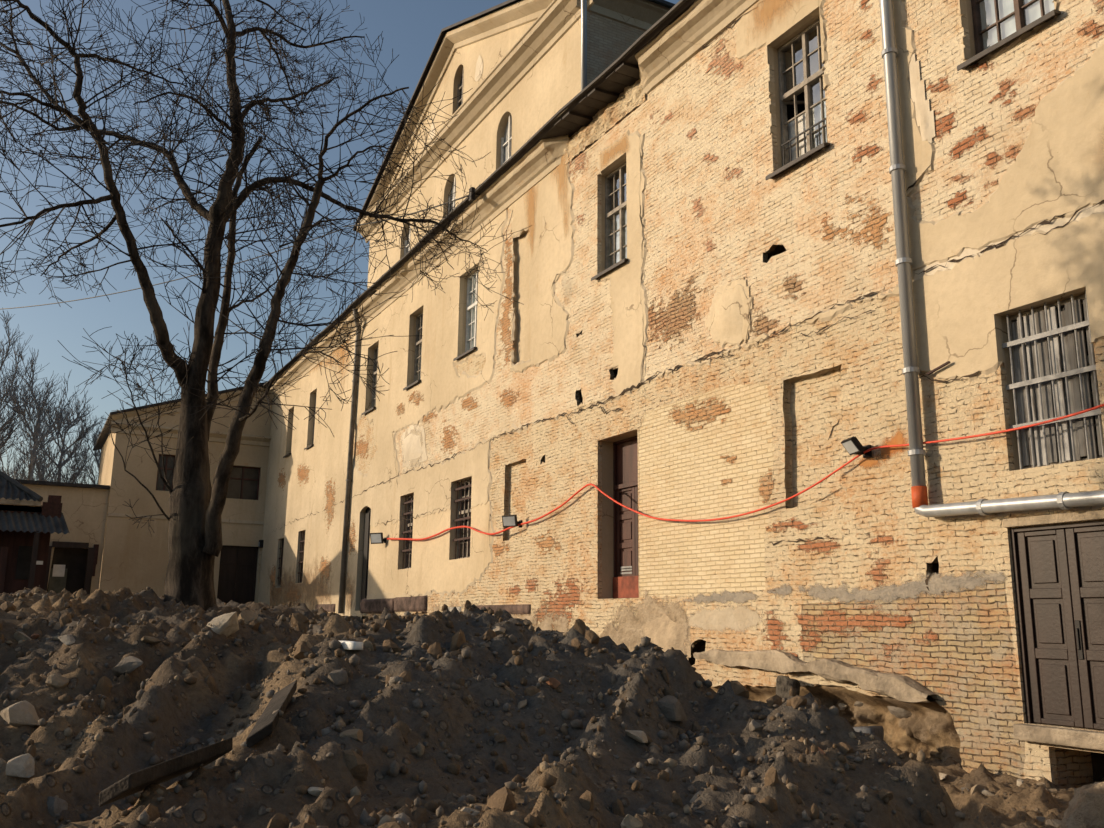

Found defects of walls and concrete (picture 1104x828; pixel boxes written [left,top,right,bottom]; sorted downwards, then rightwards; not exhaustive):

crack [637,136,645,242]
crack [915,200,1104,274]
peeling [353,417,377,475]
crack [286,289,883,526]
peeling [367,0,1104,786]
spalling [325,480,336,529]